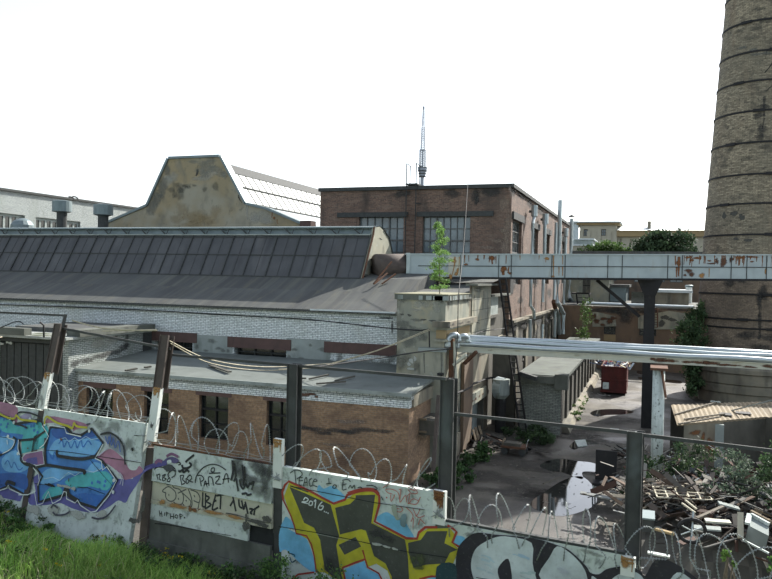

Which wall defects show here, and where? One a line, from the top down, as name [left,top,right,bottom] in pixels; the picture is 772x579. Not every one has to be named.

corrosion [449,255,512,279]
corrosion [675,255,772,278]